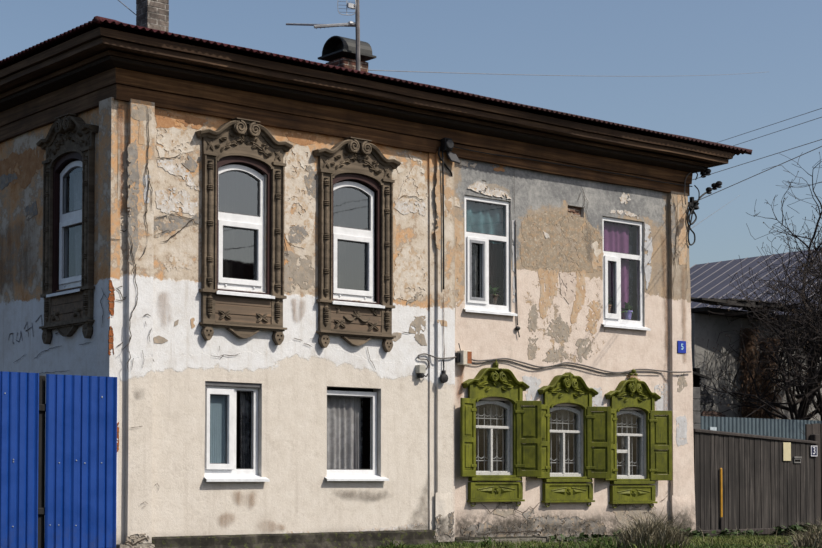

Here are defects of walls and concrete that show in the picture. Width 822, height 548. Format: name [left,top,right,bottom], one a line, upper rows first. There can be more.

peeling [0,146,45,190]
flaking render [107,280,115,355]
crack [100,108,200,372]
peeling [127,103,208,265]
peeling [392,316,427,346]
peeling [393,155,465,307]
peeling [512,206,604,364]
peeling [610,193,653,289]
flaking render [125,533,150,546]